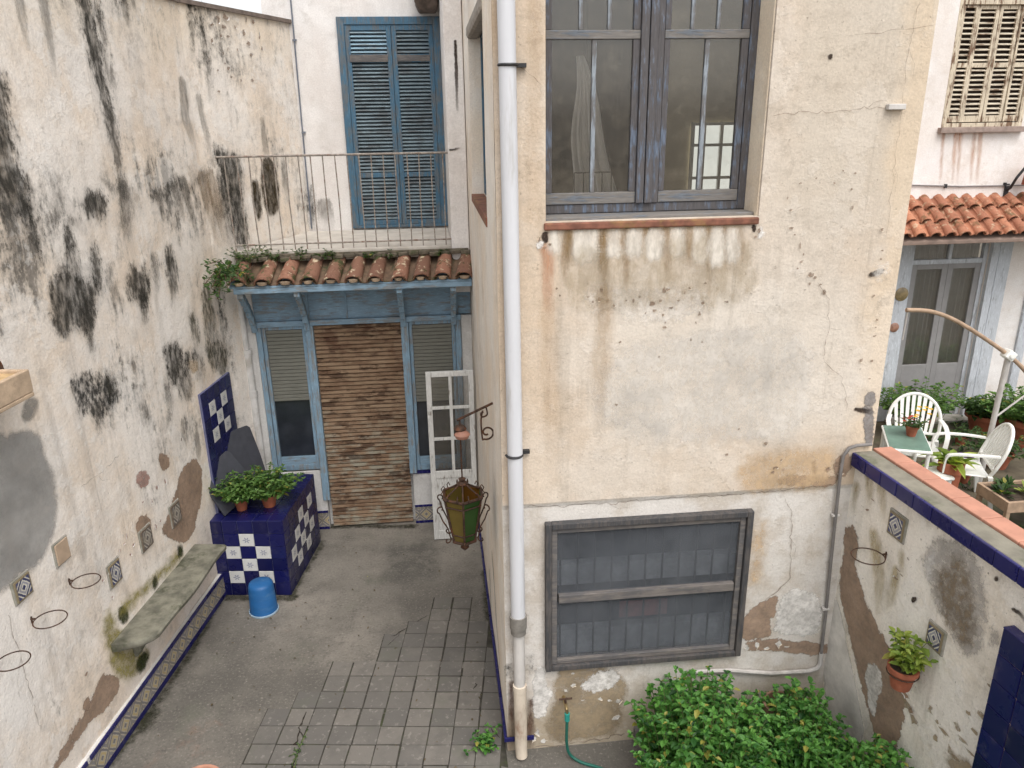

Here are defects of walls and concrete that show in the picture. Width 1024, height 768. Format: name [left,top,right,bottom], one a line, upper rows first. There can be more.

leakage [77,0,123,165]
leakage [0,71,111,340]
leakage [126,246,177,315]
leakage [214,146,283,247]
leakage [549,227,736,272]
peeling [119,453,202,556]
peeling [742,588,828,656]
peeling [839,524,917,751]
peeling [53,671,119,768]
peeling [532,666,622,743]
leakage [547,668,627,742]
peeling [929,705,984,768]